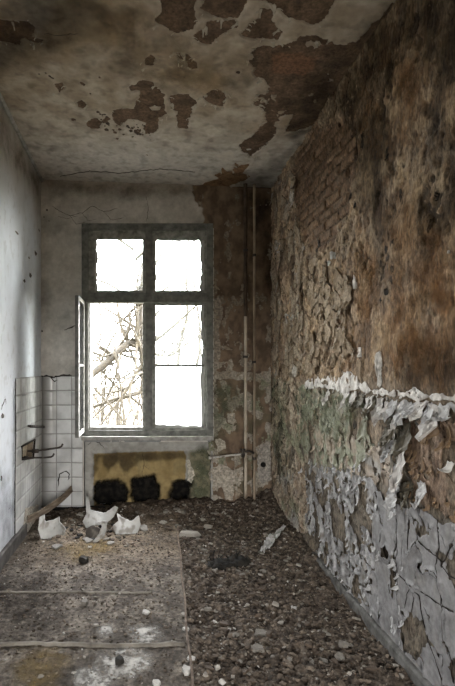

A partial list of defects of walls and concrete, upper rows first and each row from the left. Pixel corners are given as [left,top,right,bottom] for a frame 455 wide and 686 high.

peeling [0,19,43,50]
peeling [71,55,231,140]
crack [60,169,192,177]
peeling [152,0,455,686]
leakage [96,453,156,470]
crack [392,519,455,686]